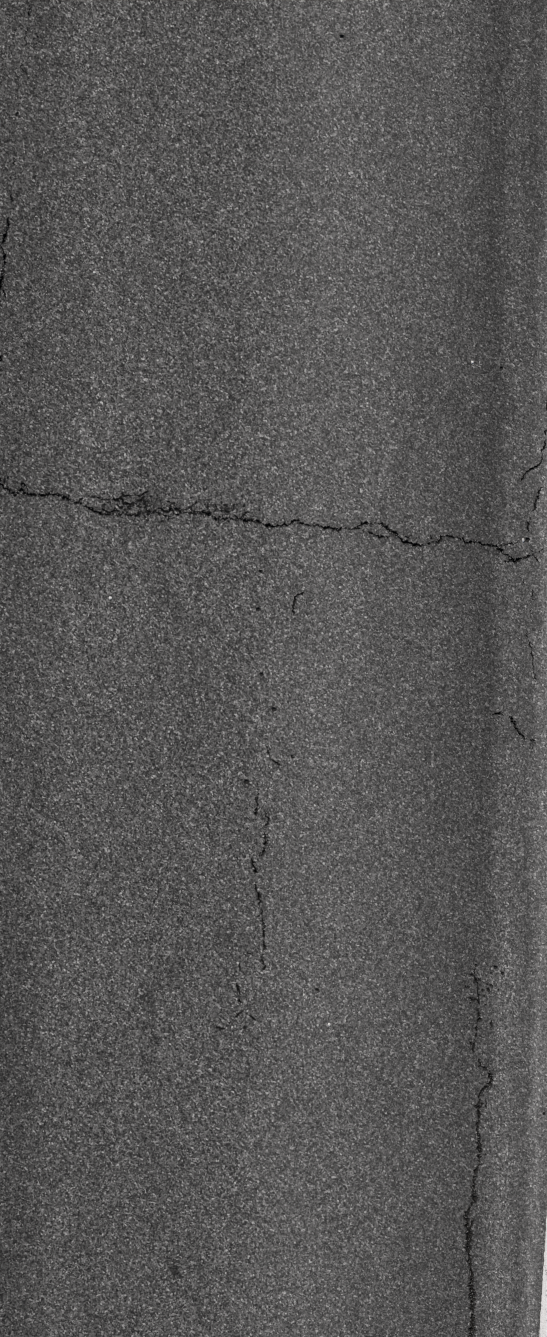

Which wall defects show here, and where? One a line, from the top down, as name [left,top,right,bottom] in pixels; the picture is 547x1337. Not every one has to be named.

crack [0,0,32,306]
crack [0,402,547,681]
crack [215,746,294,1030]
crack [452,969,494,1337]